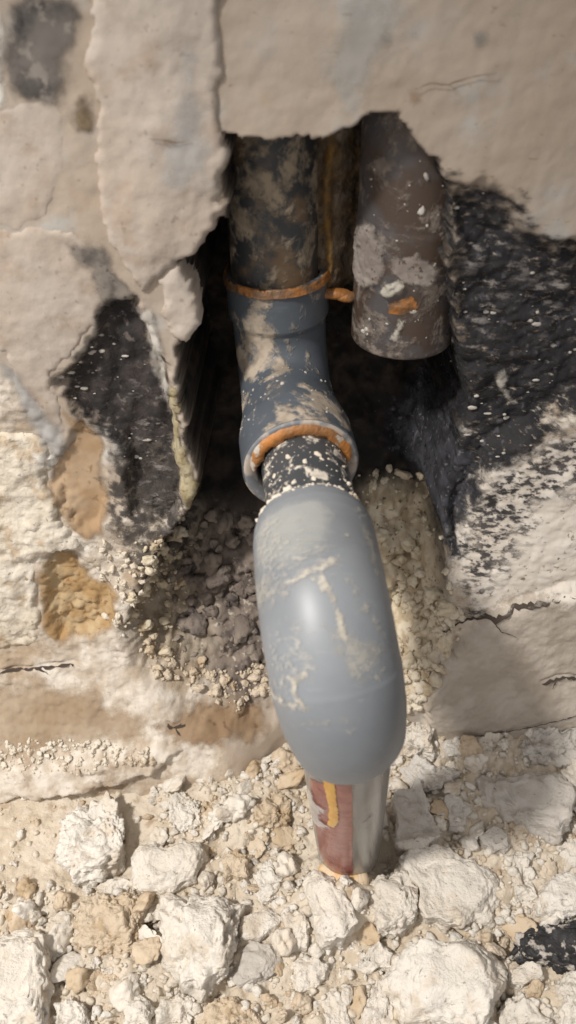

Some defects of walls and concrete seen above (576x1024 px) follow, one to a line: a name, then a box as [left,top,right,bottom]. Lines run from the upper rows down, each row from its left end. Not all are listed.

water stain [0,0,80,103]
peeling [0,99,204,533]
peeling [0,431,81,648]
crack [0,663,74,674]
crack [443,596,576,638]
crack [542,676,576,688]